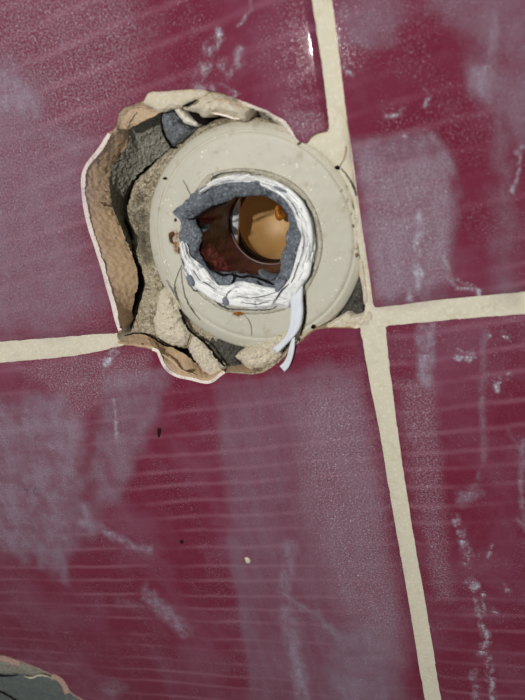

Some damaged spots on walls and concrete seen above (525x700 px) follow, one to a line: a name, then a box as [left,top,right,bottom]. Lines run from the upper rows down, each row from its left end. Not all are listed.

spalling [81,99,299,384]
spalling [0,655,84,700]